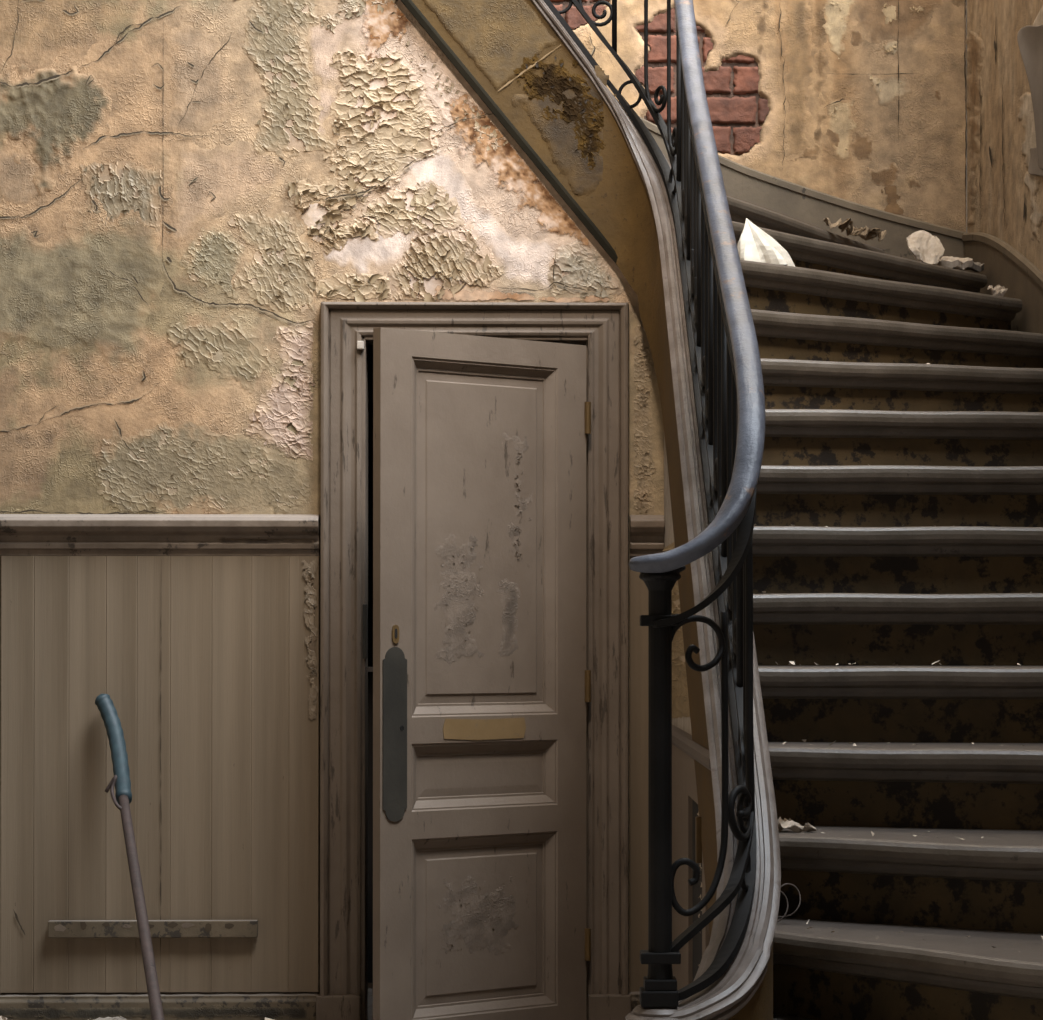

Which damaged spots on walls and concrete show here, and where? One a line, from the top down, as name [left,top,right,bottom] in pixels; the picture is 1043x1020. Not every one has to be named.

crack [0,177,98,238]
crack [0,0,262,149]
crack [158,167,318,325]
peeling [79,0,625,514]
damp [513,50,606,173]
flaking render [635,7,676,133]
flaking render [696,26,769,156]
damp [754,0,921,215]
damp [850,0,944,47]
peeling [1017,92,1043,243]
crack [0,371,160,450]
crack [0,507,173,515]